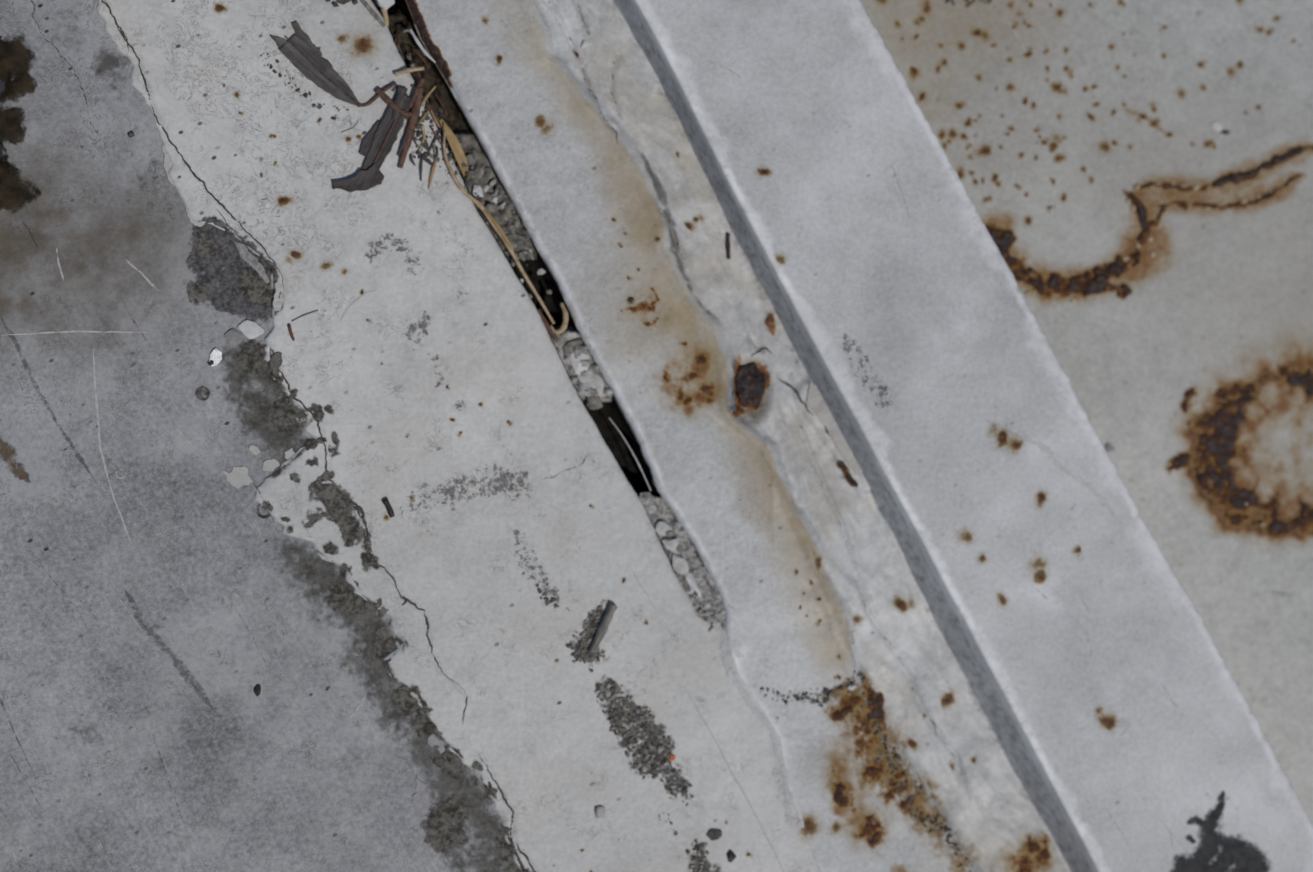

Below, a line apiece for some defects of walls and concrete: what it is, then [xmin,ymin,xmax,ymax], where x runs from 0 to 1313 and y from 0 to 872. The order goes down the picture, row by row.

spalling [0,36,41,212]
crack [101,0,284,297]
spalling [208,320,264,367]
peeling [231,239,283,311]
peeling [222,445,295,489]
crack [279,369,467,721]
crack [371,0,733,608]
corrosion [662,342,721,416]
corrosion [984,144,1313,303]
corrosion [1166,349,1313,542]
crack [479,754,536,872]
corrosion [801,674,972,872]